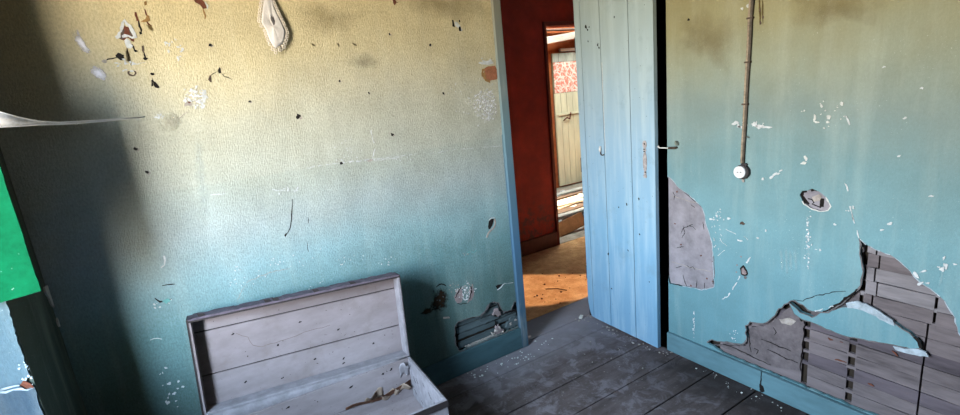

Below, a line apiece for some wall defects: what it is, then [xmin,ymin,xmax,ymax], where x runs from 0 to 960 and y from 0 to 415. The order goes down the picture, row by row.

spalling [93,1,153,78]
spalling [442,58,497,126]
flaking render [668,177,767,290]
spalling [801,189,832,212]
flaking render [421,282,518,352]
flaking render [707,238,960,415]